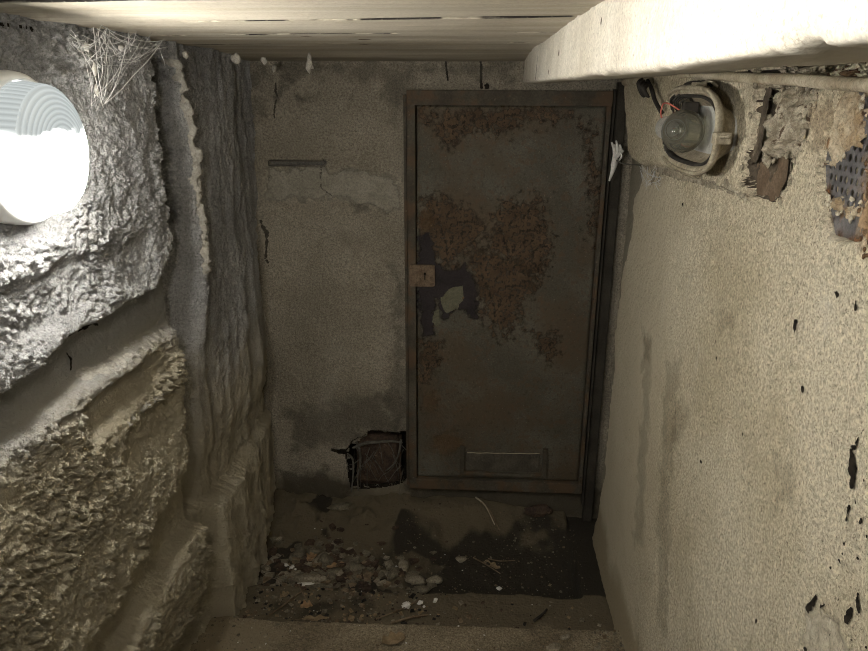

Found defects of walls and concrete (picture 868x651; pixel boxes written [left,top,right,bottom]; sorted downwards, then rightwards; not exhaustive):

spalling [779,62,868,77]
spalling [641,68,822,205]
peeling [825,192,863,224]
spalling [345,429,407,489]
flaking render [803,616,844,651]